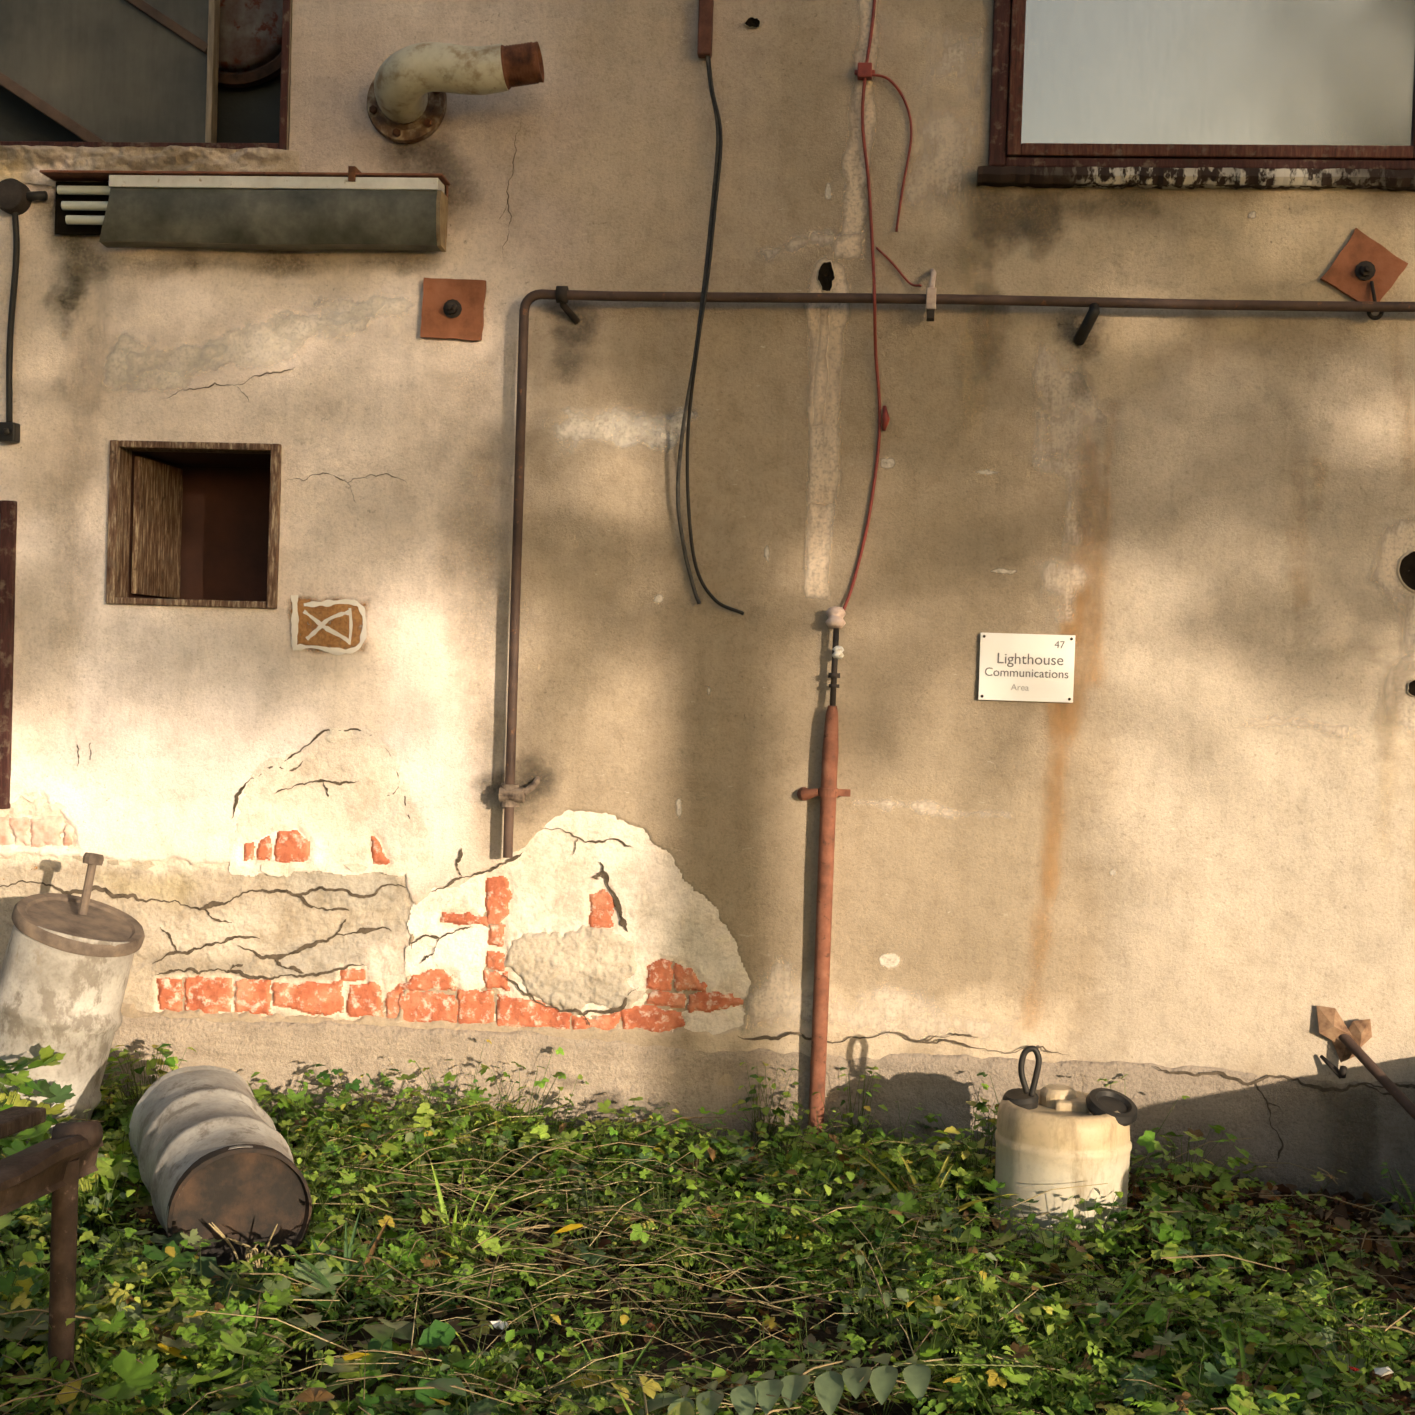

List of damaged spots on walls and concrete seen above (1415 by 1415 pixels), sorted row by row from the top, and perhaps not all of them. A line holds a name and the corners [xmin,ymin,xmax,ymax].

crack [499,127,521,253]
crack [0,828,631,980]
flaking render [0,727,751,1035]
crack [738,1031,1071,1057]
crack [1155,1066,1415,1162]